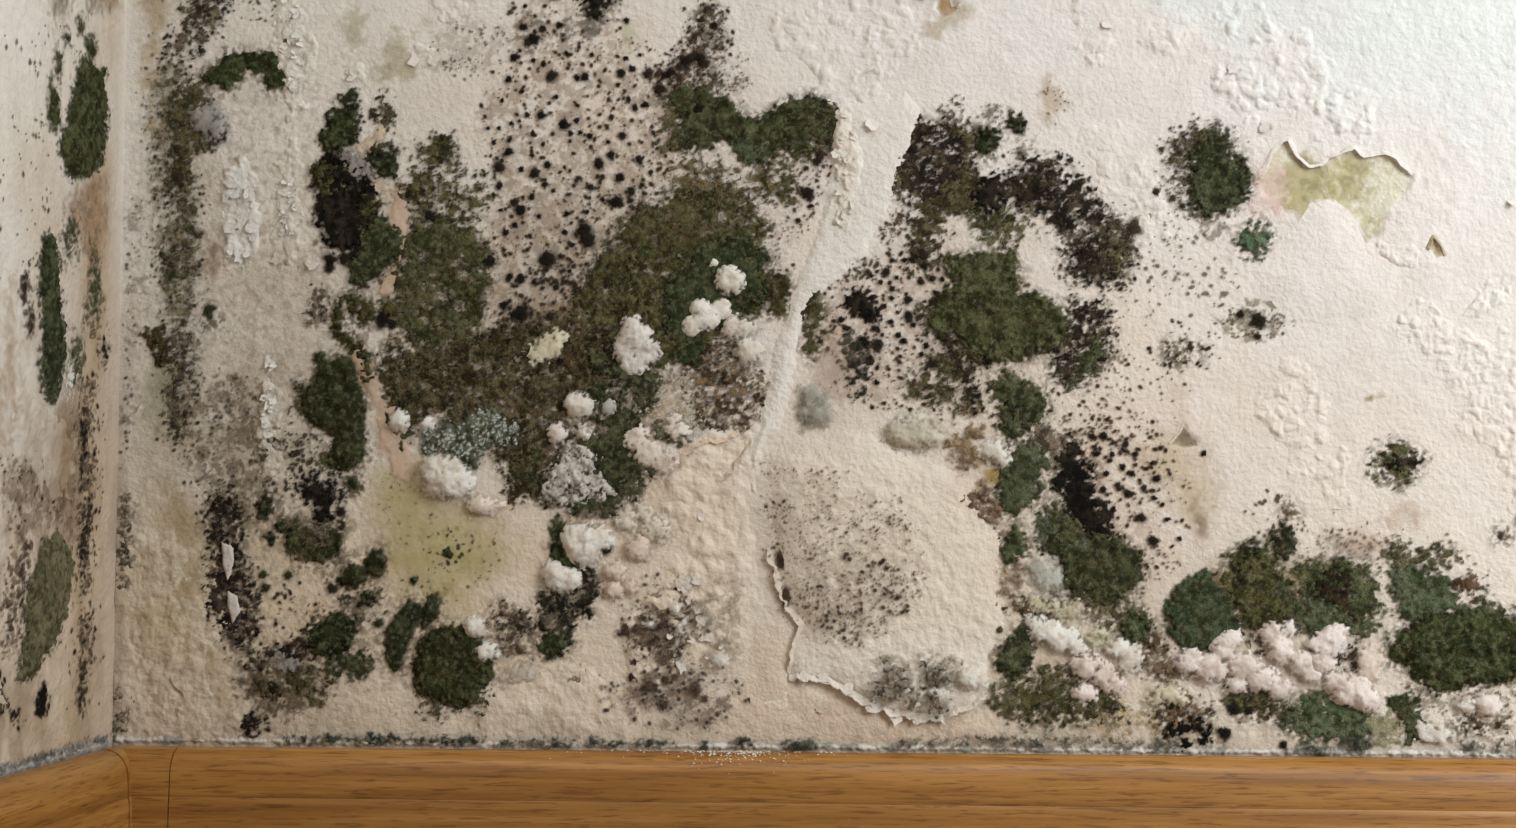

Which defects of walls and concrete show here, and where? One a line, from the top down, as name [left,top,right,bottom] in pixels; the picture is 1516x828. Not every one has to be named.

spalling [1256,120,1414,240]
leakage [612,0,1516,757]
peeling [475,422,1008,751]